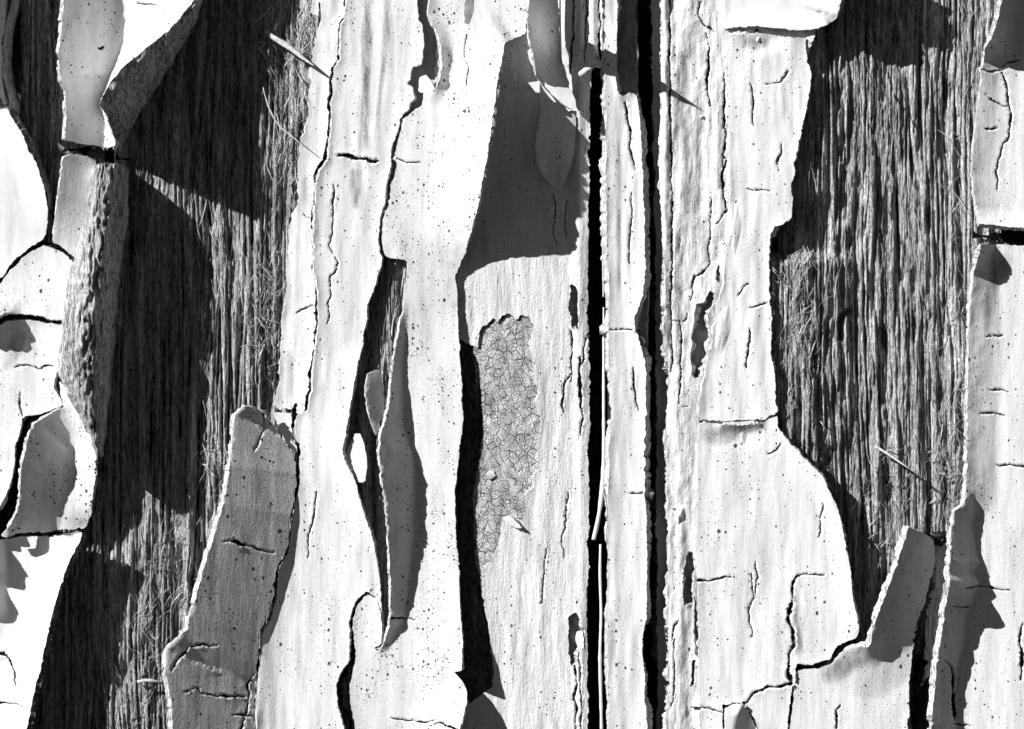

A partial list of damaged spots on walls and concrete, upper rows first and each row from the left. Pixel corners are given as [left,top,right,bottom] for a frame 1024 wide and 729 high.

crack [297,19,417,324]
peeling [513,0,602,189]
crack [625,102,635,168]
peeling [0,0,322,729]
peeling [345,252,407,648]
crack [615,329,645,410]
peeling [722,0,1024,729]
peeling [336,632,356,729]
crack [696,563,758,636]
crack [672,574,864,712]